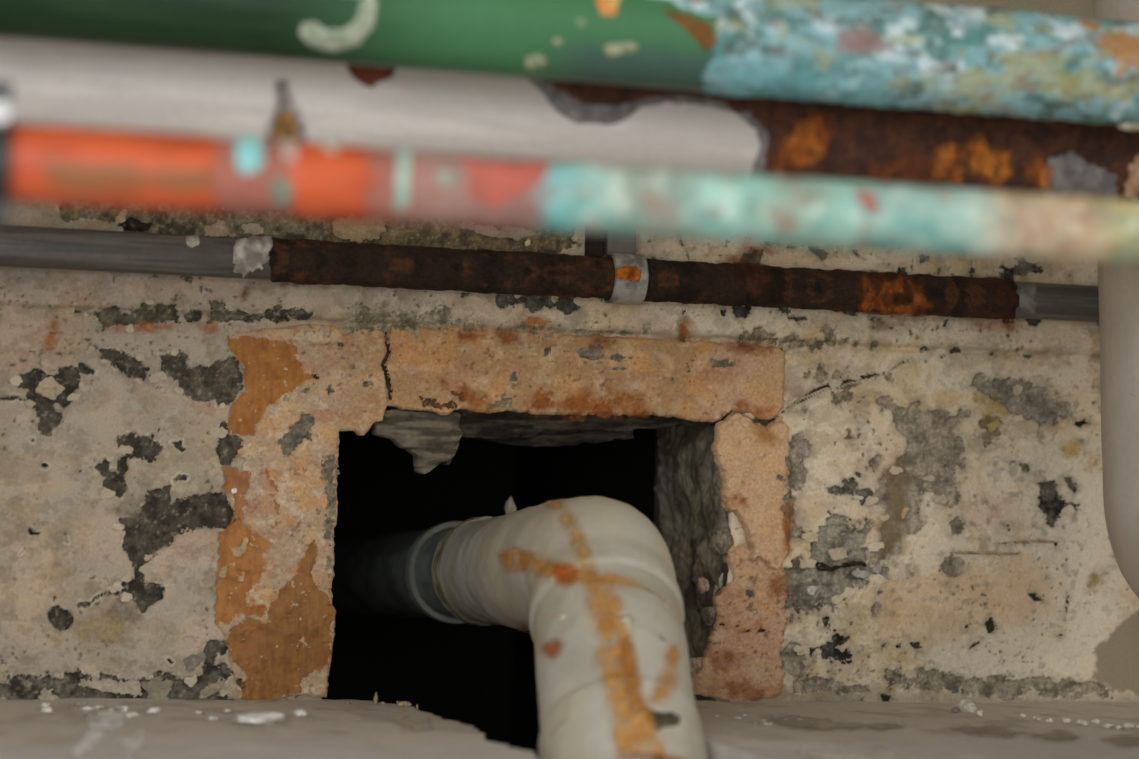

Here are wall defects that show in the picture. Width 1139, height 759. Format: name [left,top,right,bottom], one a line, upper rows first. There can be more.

rust [541,79,1139,200]
spalling [0,345,246,465]
spalling [95,428,186,501]
spalling [65,298,313,333]
crack [381,332,393,400]
spalling [338,293,652,370]
flaking render [371,391,724,474]
spalling [721,306,894,407]
spalling [107,475,236,614]
spalling [777,372,1113,702]
spalling [42,596,90,632]
spalling [0,639,245,700]